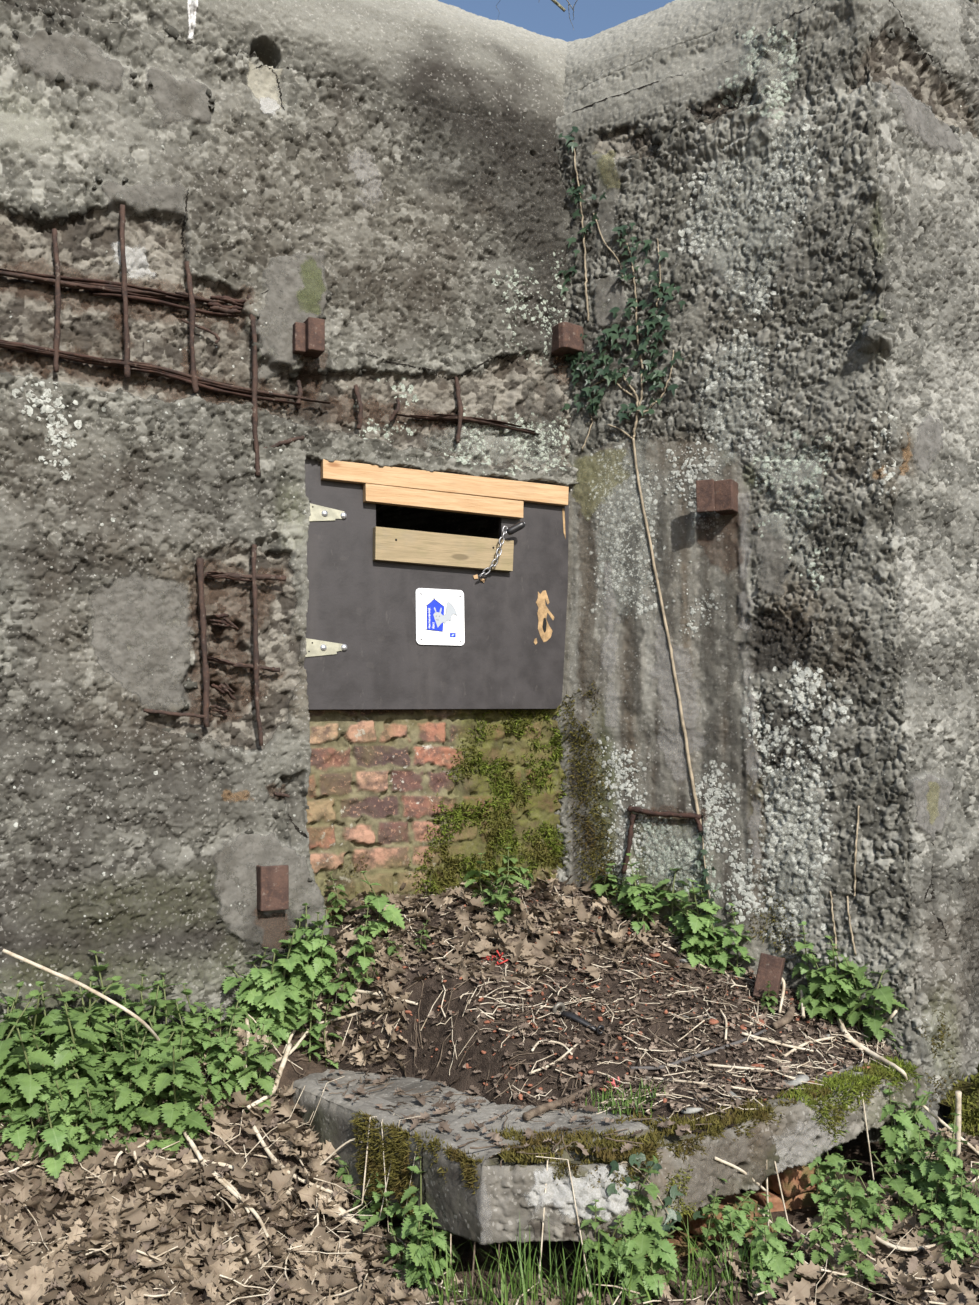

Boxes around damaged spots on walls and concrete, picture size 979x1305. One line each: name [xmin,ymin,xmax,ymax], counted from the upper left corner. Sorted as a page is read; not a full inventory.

spalling [246,60,285,114]
spalling [0,176,573,476]
spalling [82,543,303,750]